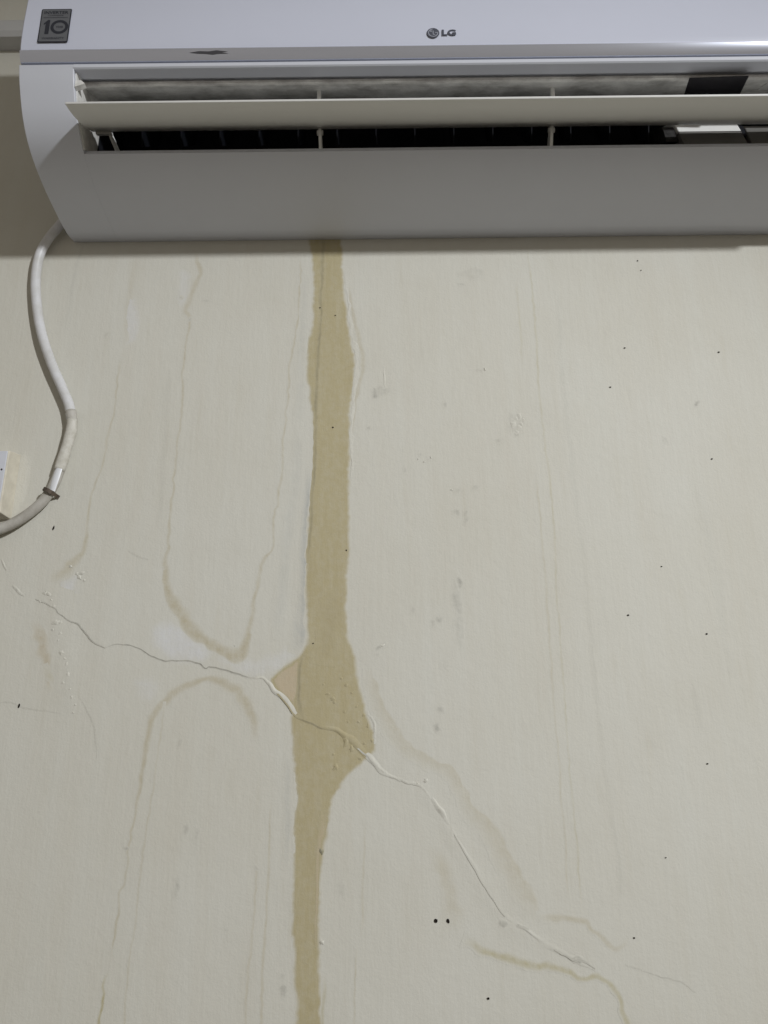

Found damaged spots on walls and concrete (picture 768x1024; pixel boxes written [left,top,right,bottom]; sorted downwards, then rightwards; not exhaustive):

crack [36,599,597,971]
water stain [96,239,633,1024]